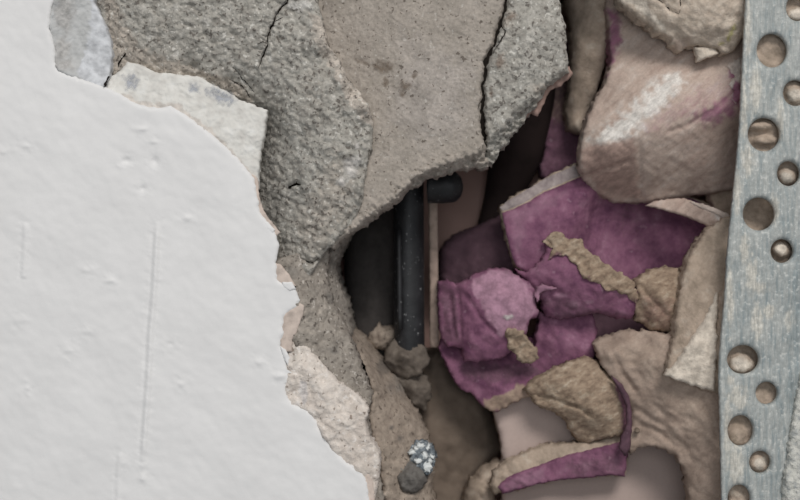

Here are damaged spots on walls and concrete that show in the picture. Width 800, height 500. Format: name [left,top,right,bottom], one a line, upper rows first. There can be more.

crack [229,0,288,97]
crack [478,0,507,152]
peeling [693,46,718,63]
spalling [49,0,505,500]
spalling [663,292,719,391]